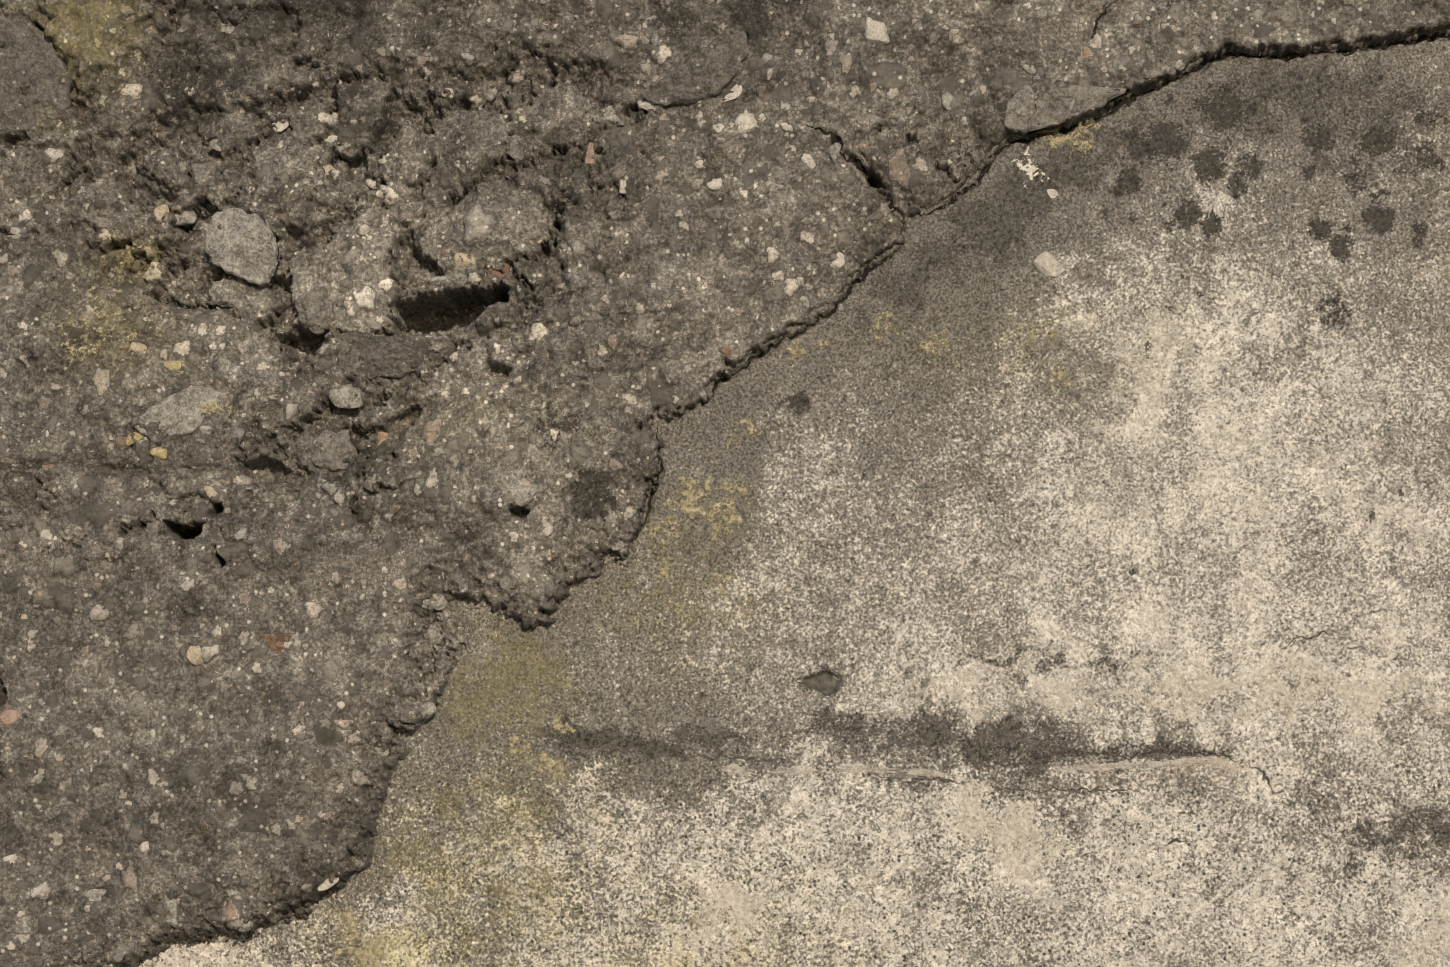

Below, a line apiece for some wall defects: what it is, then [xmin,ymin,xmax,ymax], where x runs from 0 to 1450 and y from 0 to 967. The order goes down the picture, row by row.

crack [1091,1,1116,43]
spalling [0,0,655,494]
spalling [849,103,1007,214]
crack [702,30,1450,405]
leakage [871,51,1449,322]
leakage [1314,294,1351,328]
spalling [0,673,22,786]
spalling [352,555,472,836]
crack [543,740,792,763]
peeling [795,664,847,696]
crack [855,750,1282,800]
peeling [1063,756,1241,774]